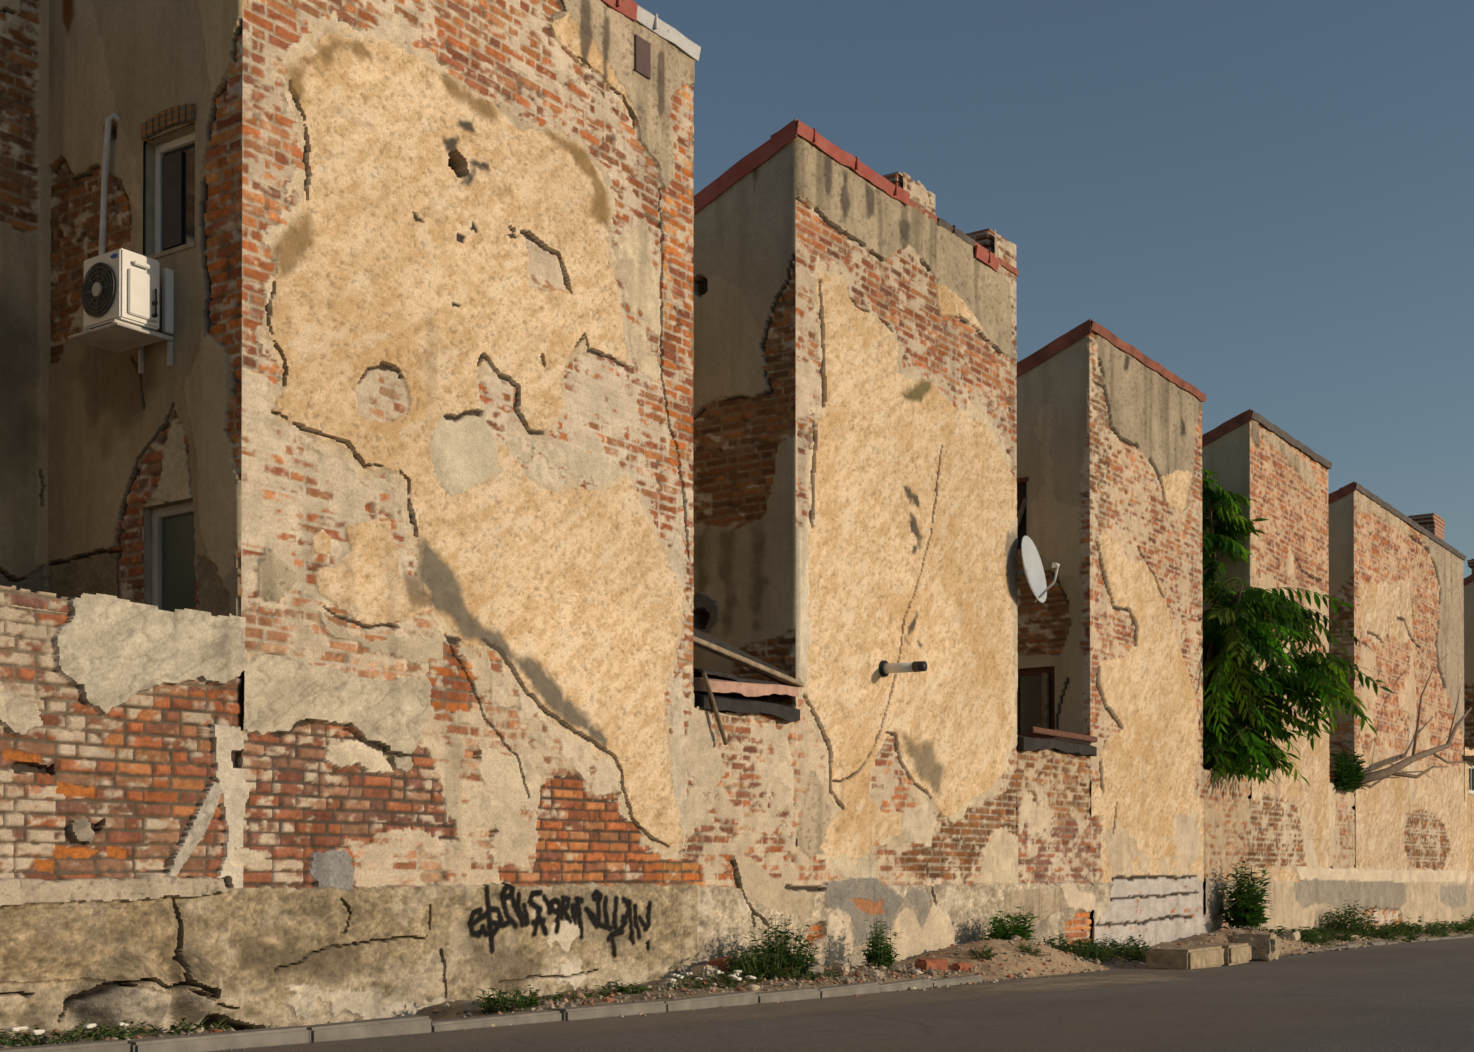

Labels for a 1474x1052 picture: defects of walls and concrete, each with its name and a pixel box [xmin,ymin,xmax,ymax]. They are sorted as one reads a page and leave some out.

spalling [0,0,132,364]
water stain [825,156,874,216]
water stain [900,221,909,239]
crack [0,898,240,1022]
crack [274,897,448,998]
spalling [54,0,1017,888]
crack [499,968,599,981]
crack [803,445,943,809]
spalling [730,629,1095,967]
spalling [1017,549,1071,655]
spalling [1090,331,1249,799]
spalling [1247,418,1474,884]